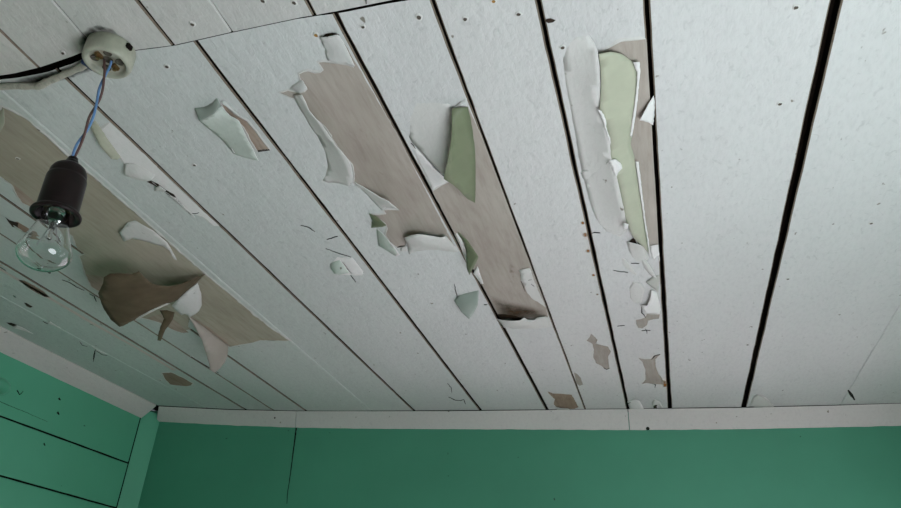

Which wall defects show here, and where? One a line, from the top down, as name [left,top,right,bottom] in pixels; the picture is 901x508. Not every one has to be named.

peeling [0,99,292,386]
peeling [278,33,551,329]
peeling [546,373,583,410]
peeling [585,333,612,370]
peeling [563,35,660,264]
peeling [634,313,661,332]